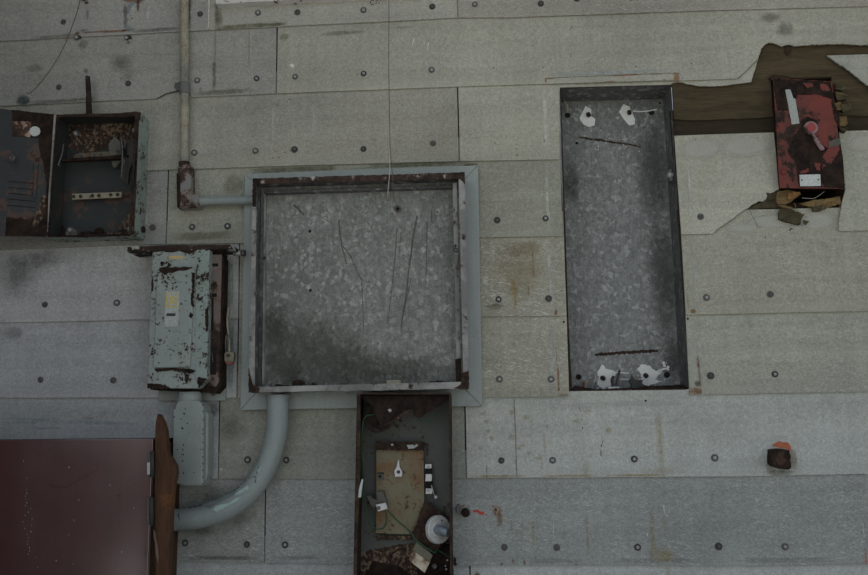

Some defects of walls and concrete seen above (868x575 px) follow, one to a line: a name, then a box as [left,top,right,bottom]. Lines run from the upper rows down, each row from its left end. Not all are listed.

spalling [748,74,852,228]